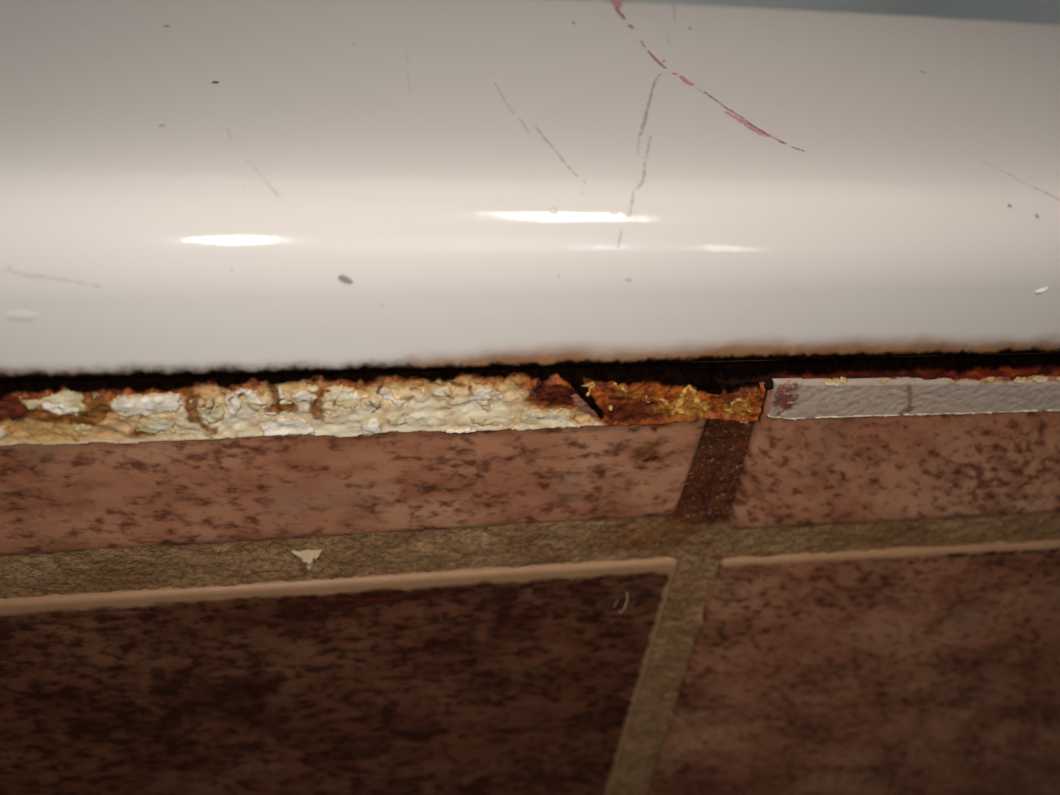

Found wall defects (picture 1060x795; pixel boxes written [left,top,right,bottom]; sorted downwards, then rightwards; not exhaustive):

water stain [0,346,1060,399]
rust [0,392,111,425]
rust [431,345,1060,526]